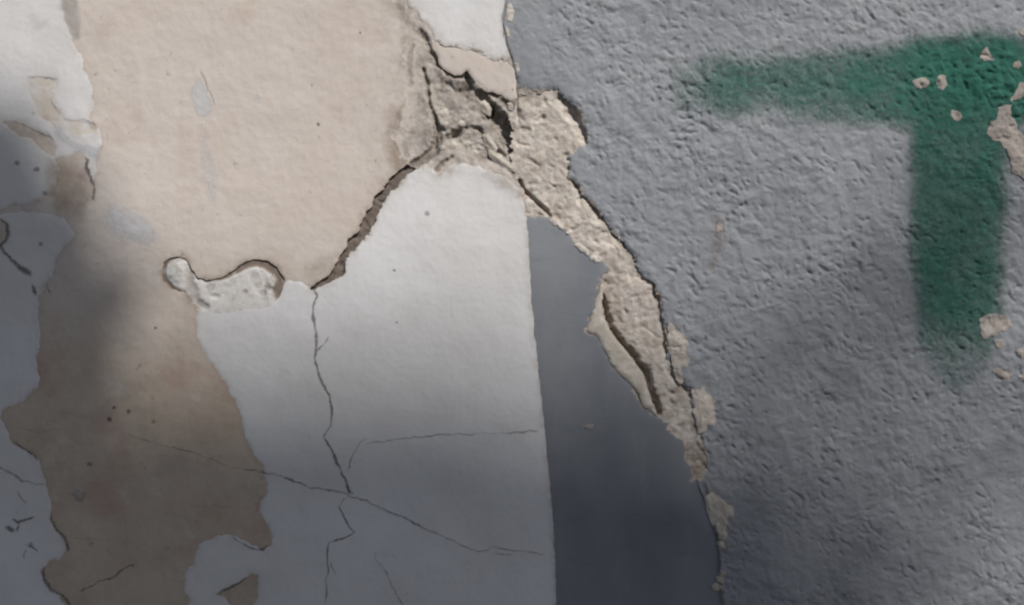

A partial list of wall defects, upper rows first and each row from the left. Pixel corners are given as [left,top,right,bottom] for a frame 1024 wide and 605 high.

peeling [912,75,947,90]
peeling [979,47,995,61]
peeling [987,82,1024,179]
peeling [0,0,716,605]
peeling [979,313,1024,359]
crack [251,165,513,597]
spalling [704,492,734,550]